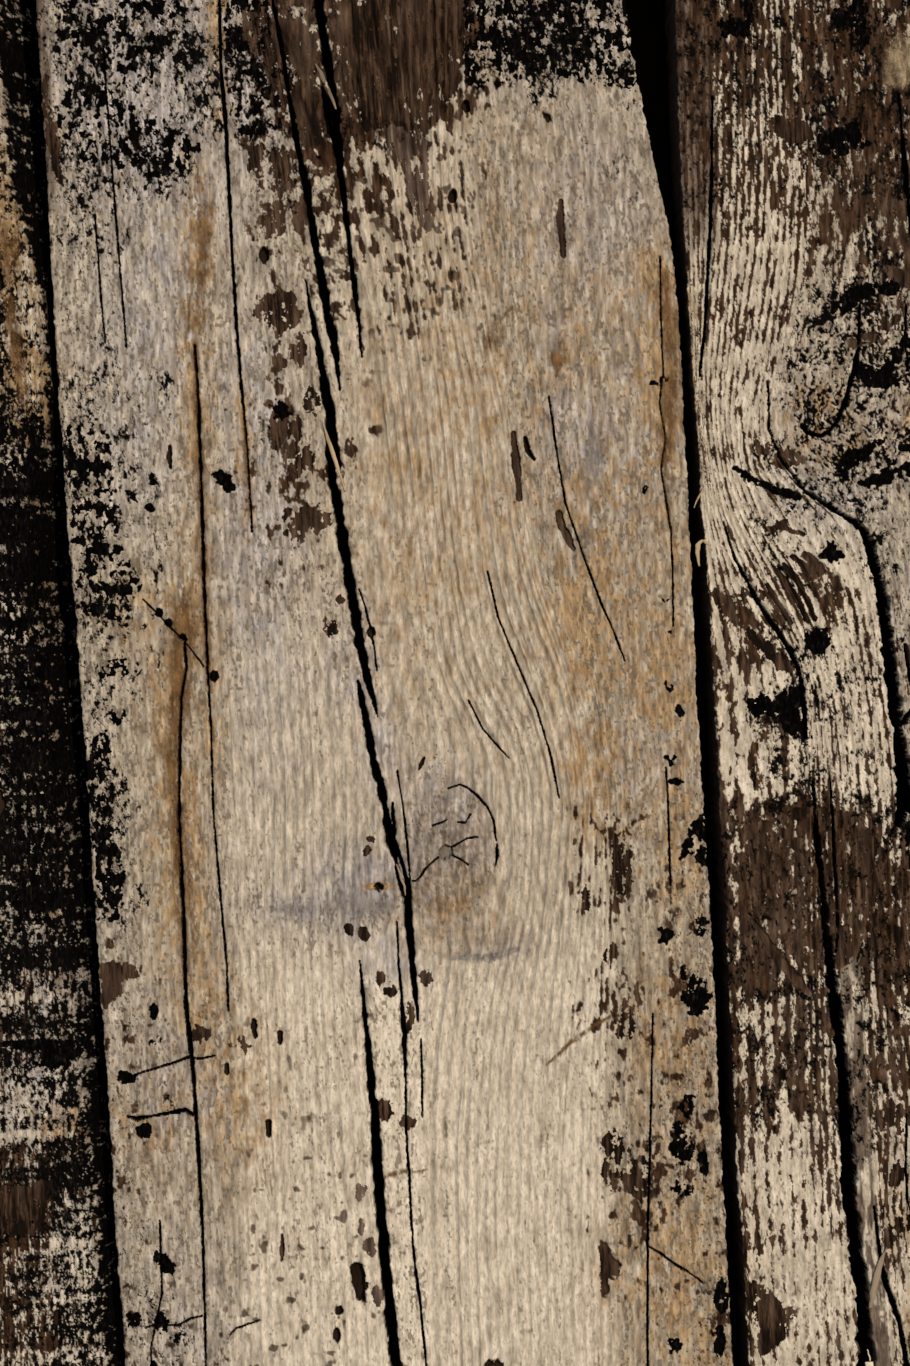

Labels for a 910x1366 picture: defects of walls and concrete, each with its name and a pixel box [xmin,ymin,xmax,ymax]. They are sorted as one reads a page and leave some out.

peeling [0,411,67,933]
peeling [85,705,127,922]
peeling [41,0,201,194]
crack [126,345,260,1366]
crack [217,0,253,533]
peeling [222,0,326,242]
crack [272,0,499,1366]
peeling [330,0,637,227]
crack [766,304,910,836]
crack [811,780,910,1366]
peeling [834,439,910,490]
crack [897,94,910,239]